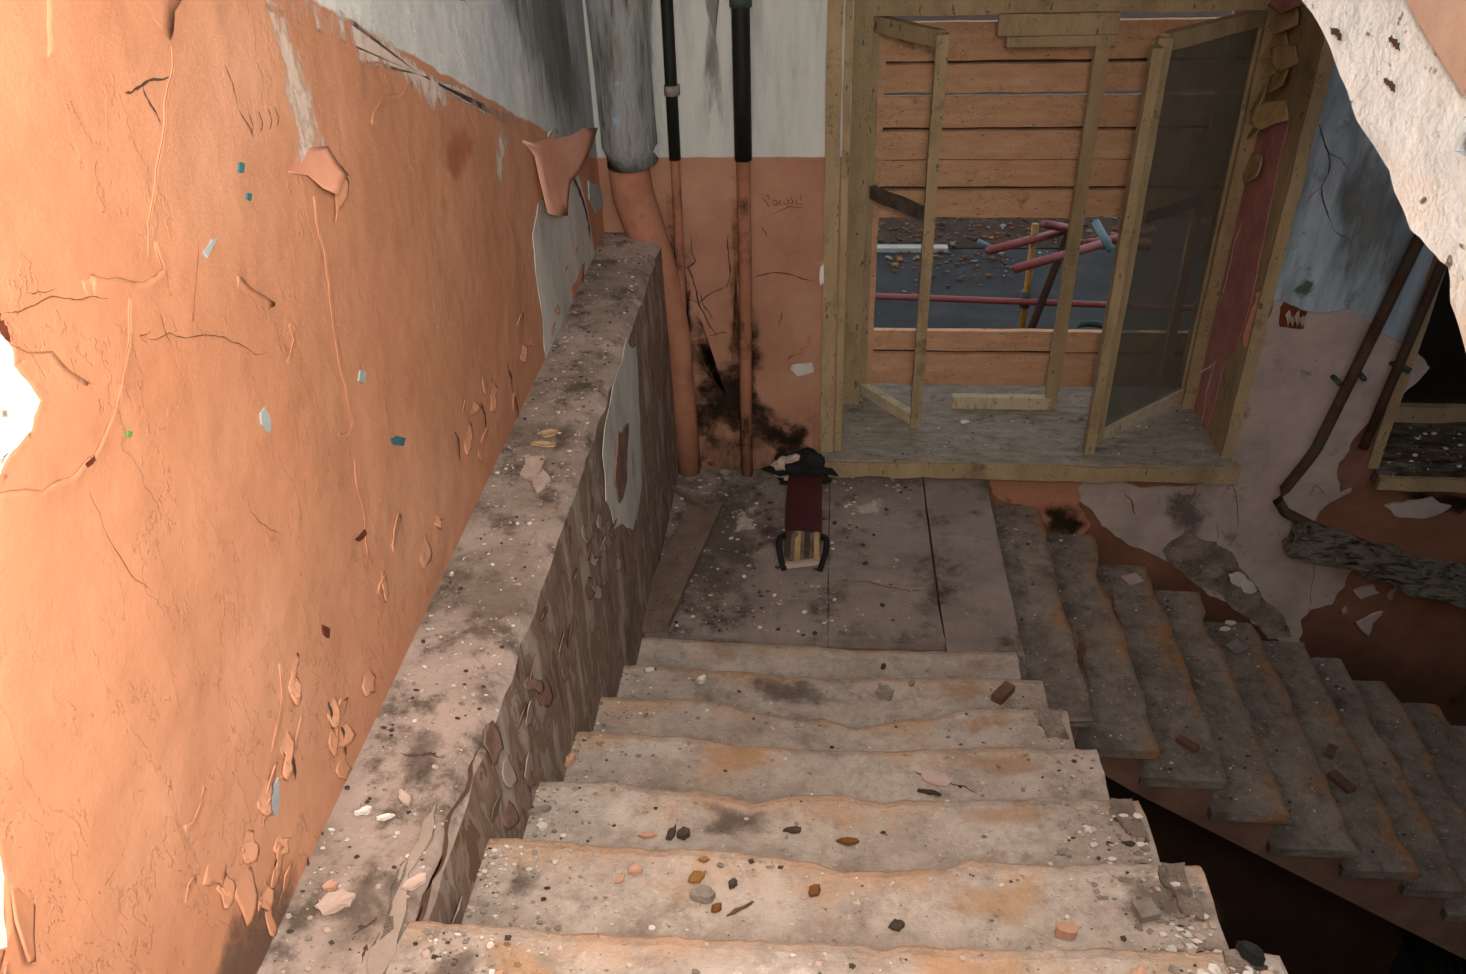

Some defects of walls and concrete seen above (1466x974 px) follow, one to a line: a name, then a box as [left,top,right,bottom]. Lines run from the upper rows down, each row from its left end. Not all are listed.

water stain [510,0,576,123]
water stain [496,130,507,181]
peeling [0,292,93,492]
spalling [202,238,218,258]
peeling [237,276,275,310]
peeling [455,127,604,463]
water stain [686,223,808,453]
peeling [1384,496,1451,519]
peeling [327,667,376,781]
peeling [184,652,310,937]
peeling [0,808,36,974]
spalling [314,879,356,916]